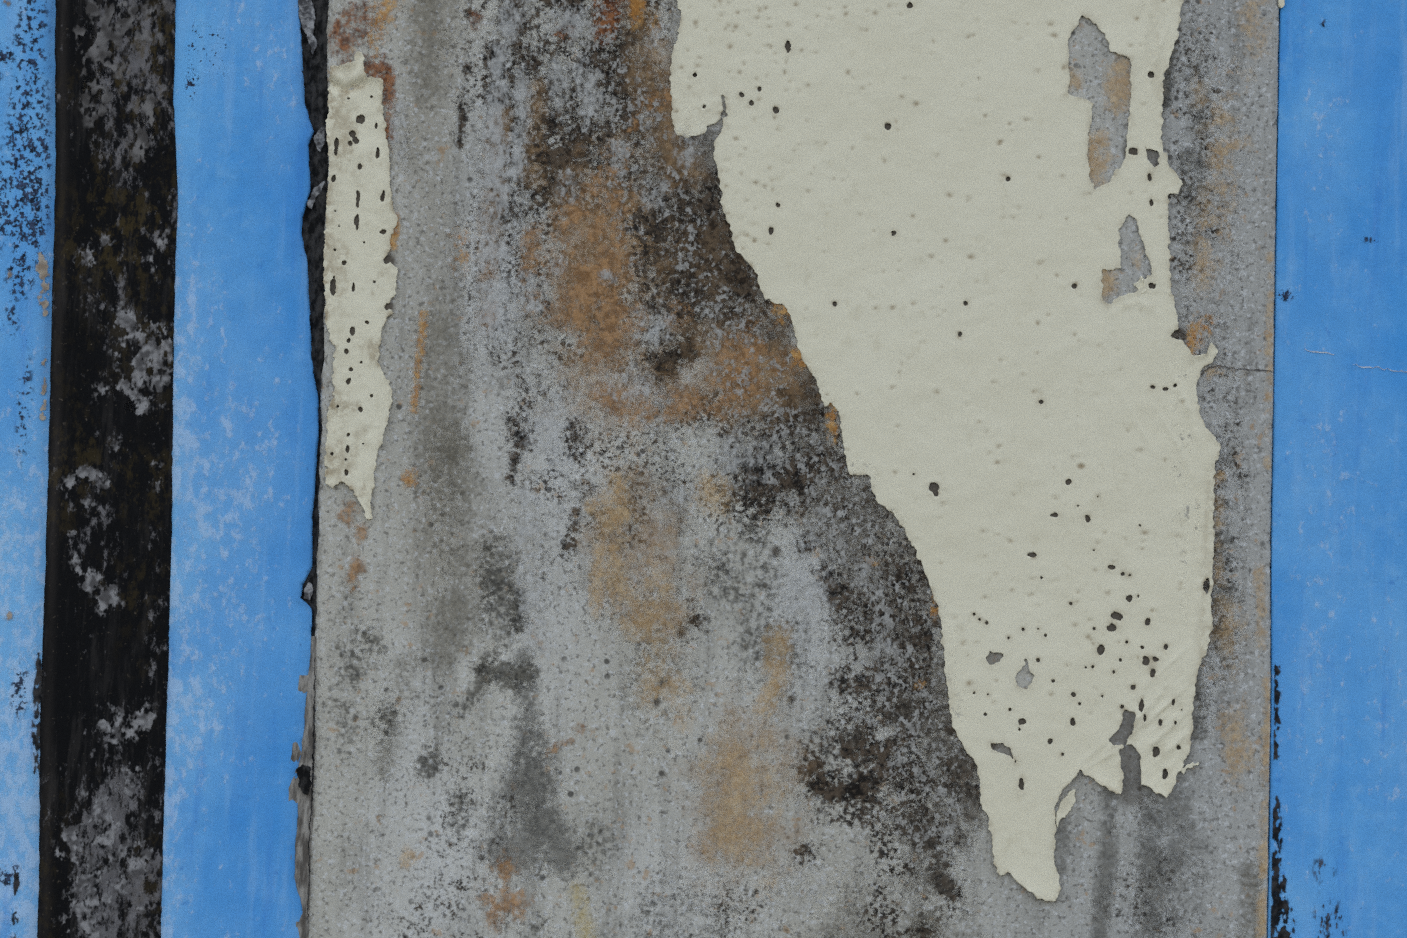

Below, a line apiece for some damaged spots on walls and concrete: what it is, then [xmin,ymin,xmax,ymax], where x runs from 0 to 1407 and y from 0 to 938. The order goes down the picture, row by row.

peeling [298,0,317,54]
peeling [36,252,49,316]
peeling [307,51,398,520]
rust [546,148,644,368]
rust [594,328,805,424]
water stain [400,0,979,938]
peeling [669,0,1221,902]
water stain [333,627,397,754]
rust [481,860,527,930]
spalling [1271,796,1295,938]
spalling [1314,903,1344,938]